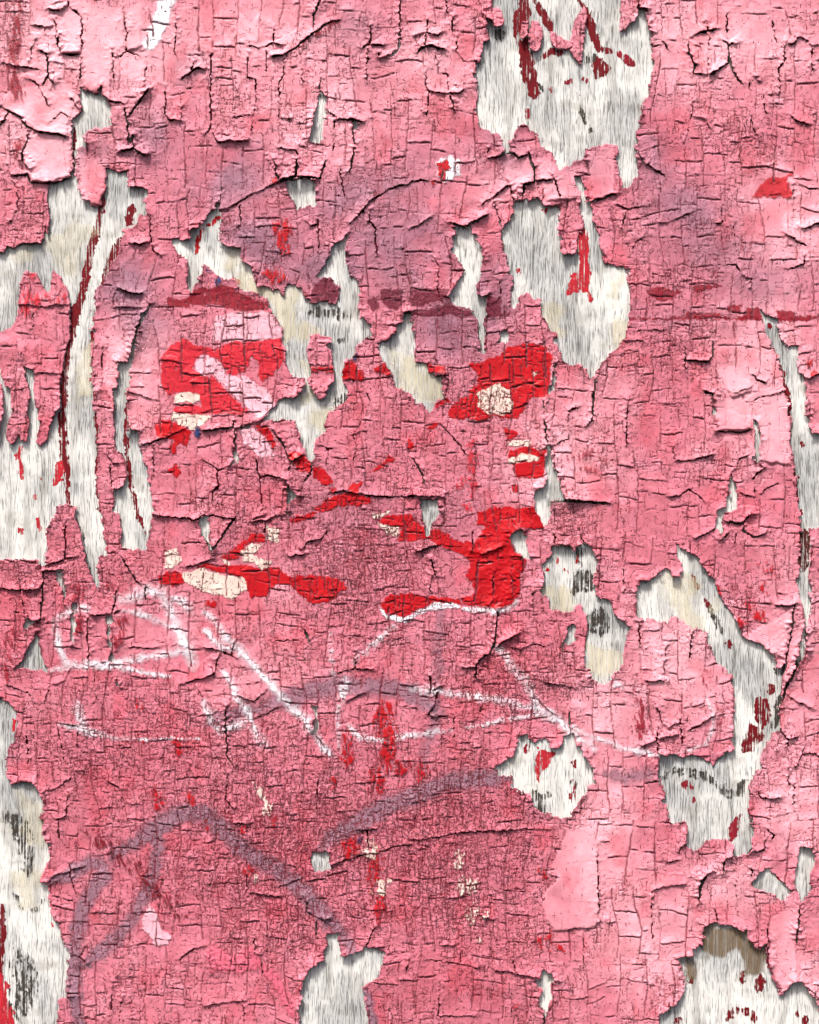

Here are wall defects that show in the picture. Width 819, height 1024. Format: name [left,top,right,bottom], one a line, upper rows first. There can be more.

crack [0,2,84,222]
crack [108,0,427,255]
crack [362,0,479,115]
crack [451,148,561,229]
peeling [439,0,662,416]
crack [650,16,814,133]
peeling [0,76,453,695]
crack [142,420,365,568]
peeling [508,300,819,913]
peeling [0,688,80,1024]
peeling [486,724,604,827]
peeling [647,914,819,1024]